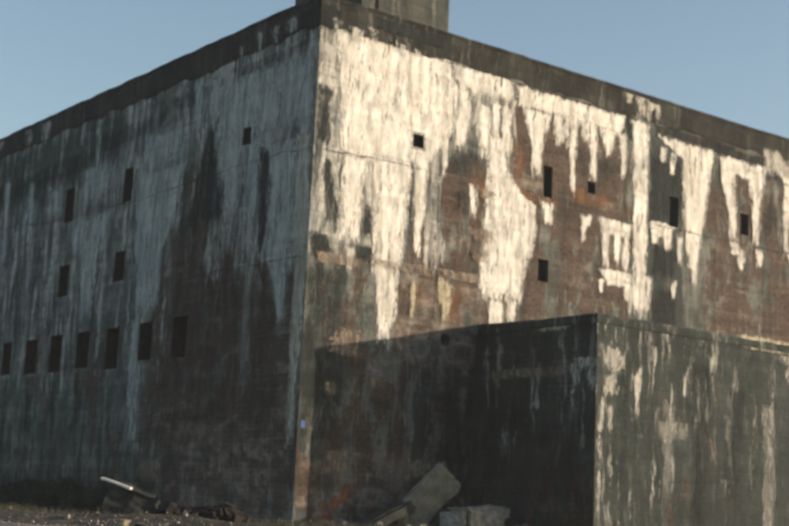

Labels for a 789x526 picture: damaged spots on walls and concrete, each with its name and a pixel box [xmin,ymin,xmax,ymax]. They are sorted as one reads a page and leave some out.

leakage [0,113,187,440]
leakage [174,4,789,438]
leakage [570,346,642,458]